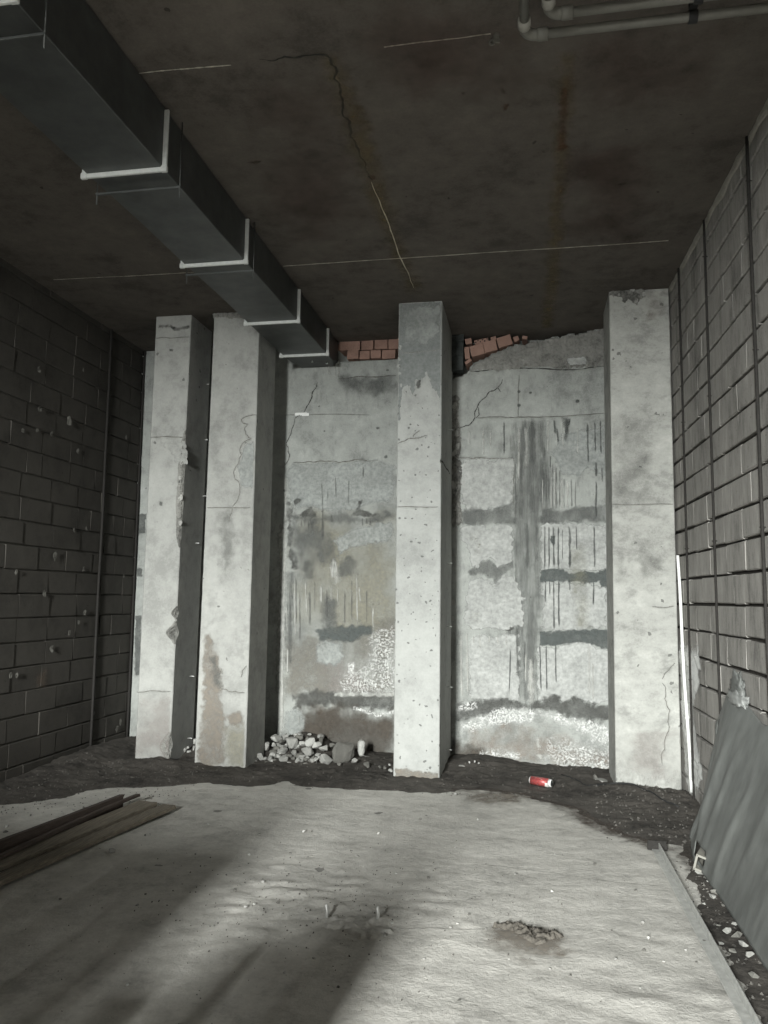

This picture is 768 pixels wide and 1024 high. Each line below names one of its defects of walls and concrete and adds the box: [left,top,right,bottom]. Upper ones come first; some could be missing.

crack [260,53,413,285]
spalling [160,431,188,547]
crack [207,413,257,523]
crack [284,374,396,466]
crack [440,366,605,506]
spalling [166,606,179,644]
water stain [450,419,703,794]